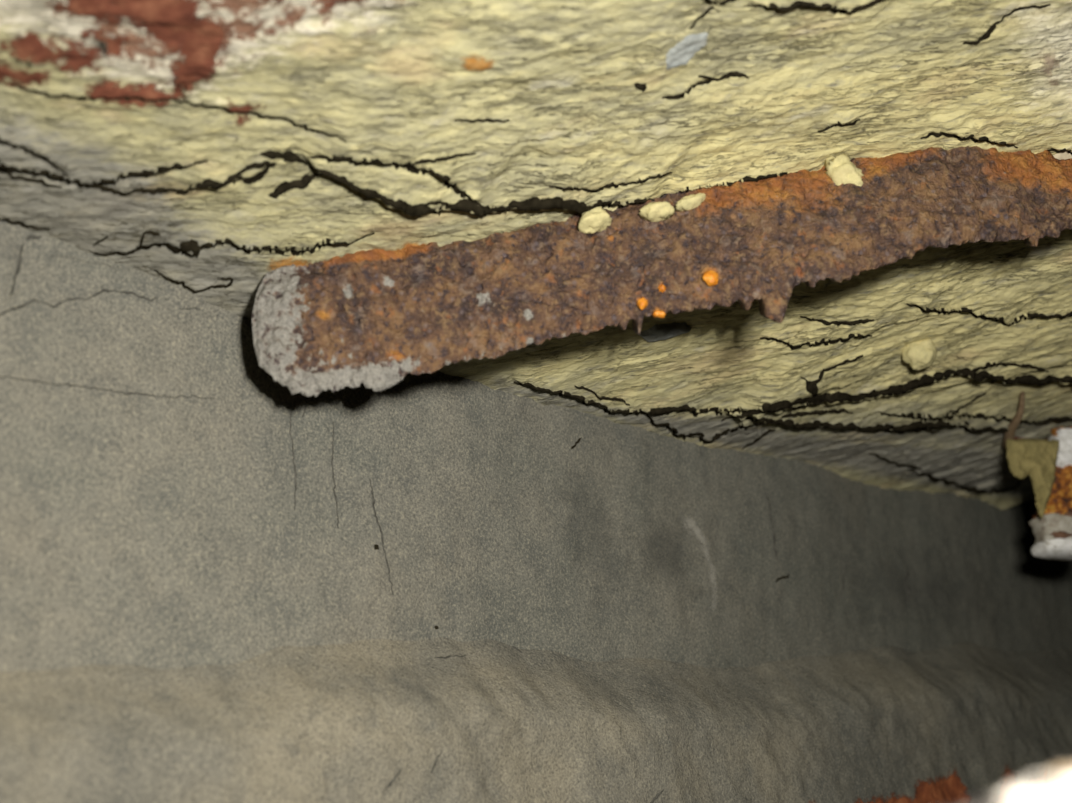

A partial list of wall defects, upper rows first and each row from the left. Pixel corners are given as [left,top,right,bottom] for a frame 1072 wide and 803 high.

crack [689,0,882,29]
corrosion [0,0,365,111]
peeling [666,32,708,70]
crack [662,71,749,100]
corrosion [227,97,265,126]
crack [0,85,797,217]
peeling [1053,151,1072,160]
crack [0,218,375,316]
corrosion [252,146,1072,398]
peeling [639,322,692,342]
crack [514,316,1072,495]
corrosion [856,770,972,803]